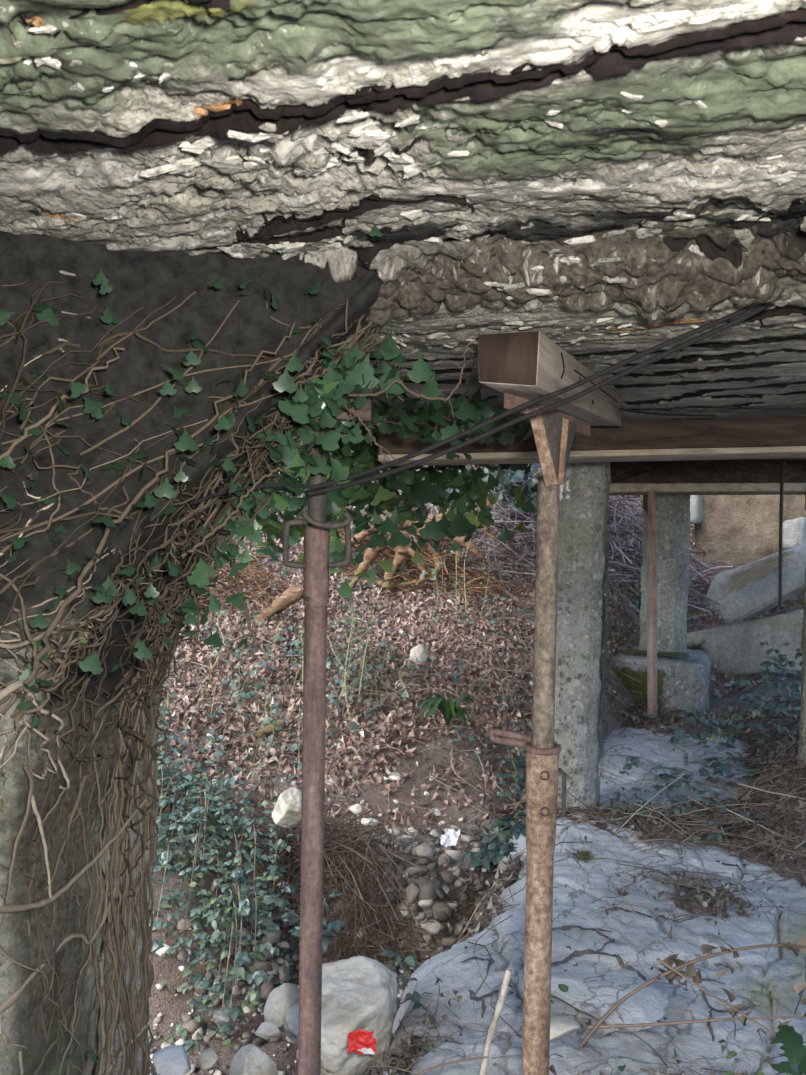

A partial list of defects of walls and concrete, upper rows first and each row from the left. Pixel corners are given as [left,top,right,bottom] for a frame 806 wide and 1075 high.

crack [68,0,153,19]
crack [183,0,231,10]
crack [0,8,806,154]
spalling [139,109,478,191]
crack [337,135,421,163]
spalling [26,210,45,229]
crack [186,193,474,280]
spalling [217,210,507,260]
spalling [531,206,783,283]
spalling [483,282,559,301]
spalling [565,317,671,345]
crack [561,306,806,414]